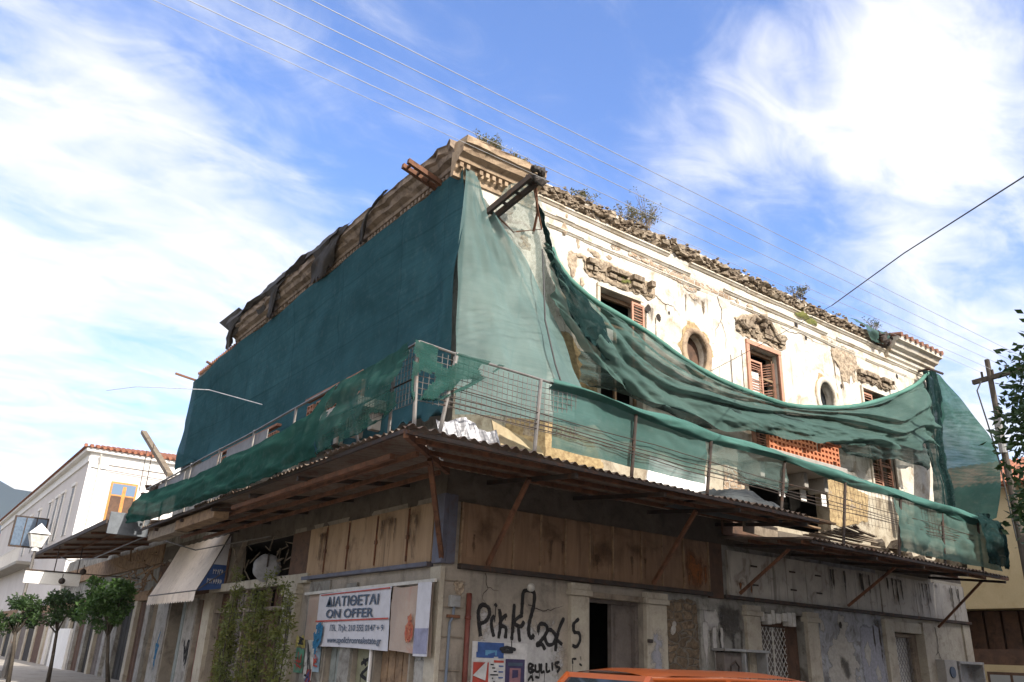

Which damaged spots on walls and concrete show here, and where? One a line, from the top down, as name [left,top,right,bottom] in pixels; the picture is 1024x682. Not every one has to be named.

spalling [561,213,786,350]
spalling [821,335,898,399]
spalling [651,599,700,670]